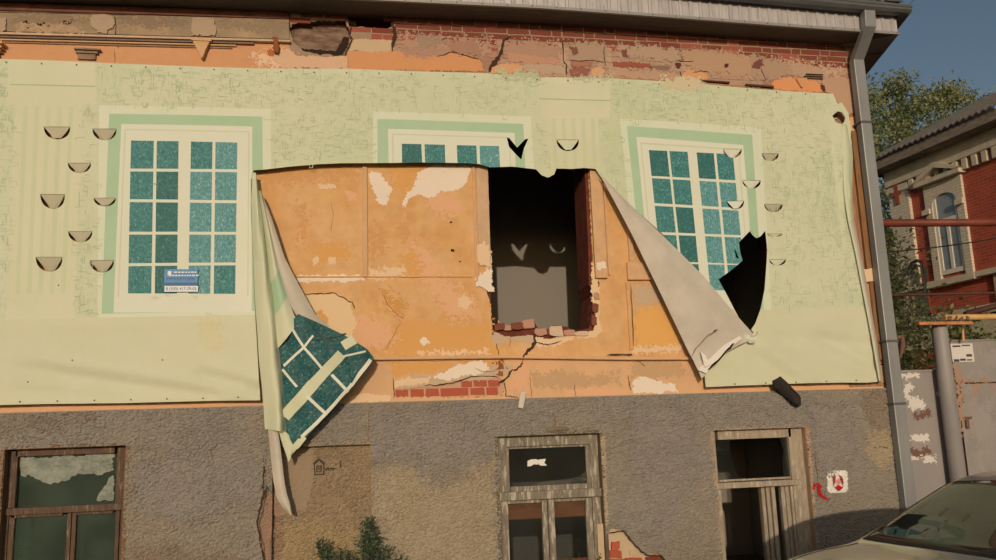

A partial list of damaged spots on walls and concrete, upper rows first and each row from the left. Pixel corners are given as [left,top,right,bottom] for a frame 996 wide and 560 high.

crack [440,36,510,73]
peeling [248,13,857,131]
peeling [369,171,393,205]
peeling [402,164,471,208]
crack [305,292,355,309]
flaking render [347,261,607,403]
crack [425,333,561,398]
peeling [564,376,678,397]
crack [256,458,265,560]
spalling [596,436,664,560]